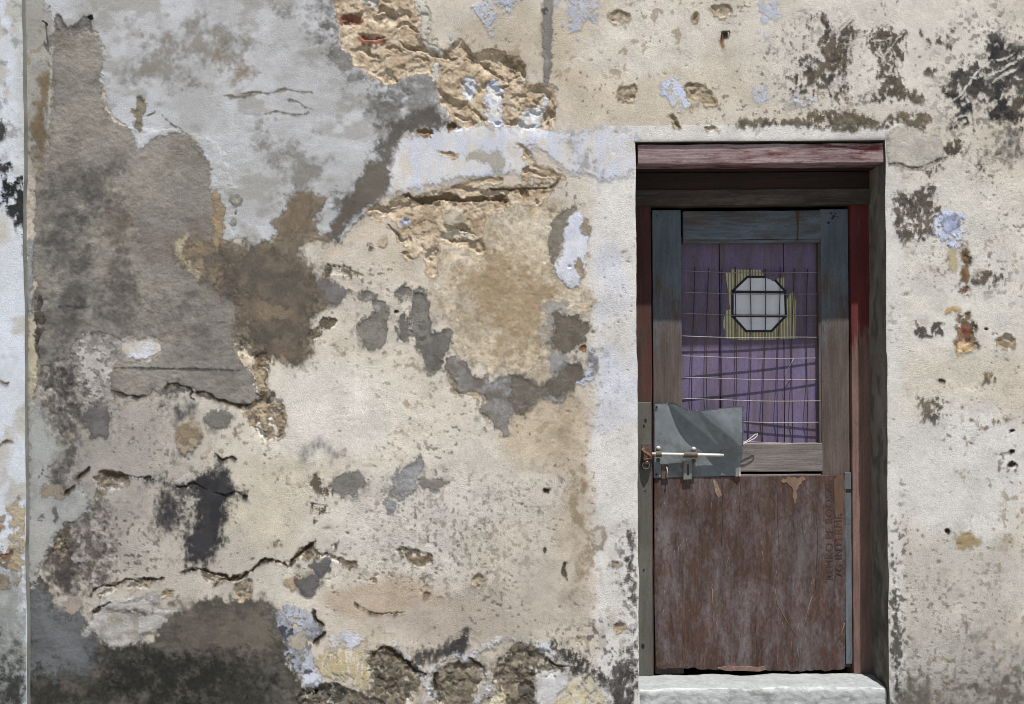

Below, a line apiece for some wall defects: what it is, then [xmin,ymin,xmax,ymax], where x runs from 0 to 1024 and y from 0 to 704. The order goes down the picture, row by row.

damp [736,11,956,132]
flaking render [330,0,596,378]
damp [893,31,1024,246]
damp [171,138,347,368]
spalling [308,317,337,341]
crack [111,383,249,407]
crack [126,475,248,500]
crack [214,453,237,461]
damp [0,497,306,704]
crack [87,539,316,615]
spalling [398,547,434,566]
peeling [273,575,563,704]